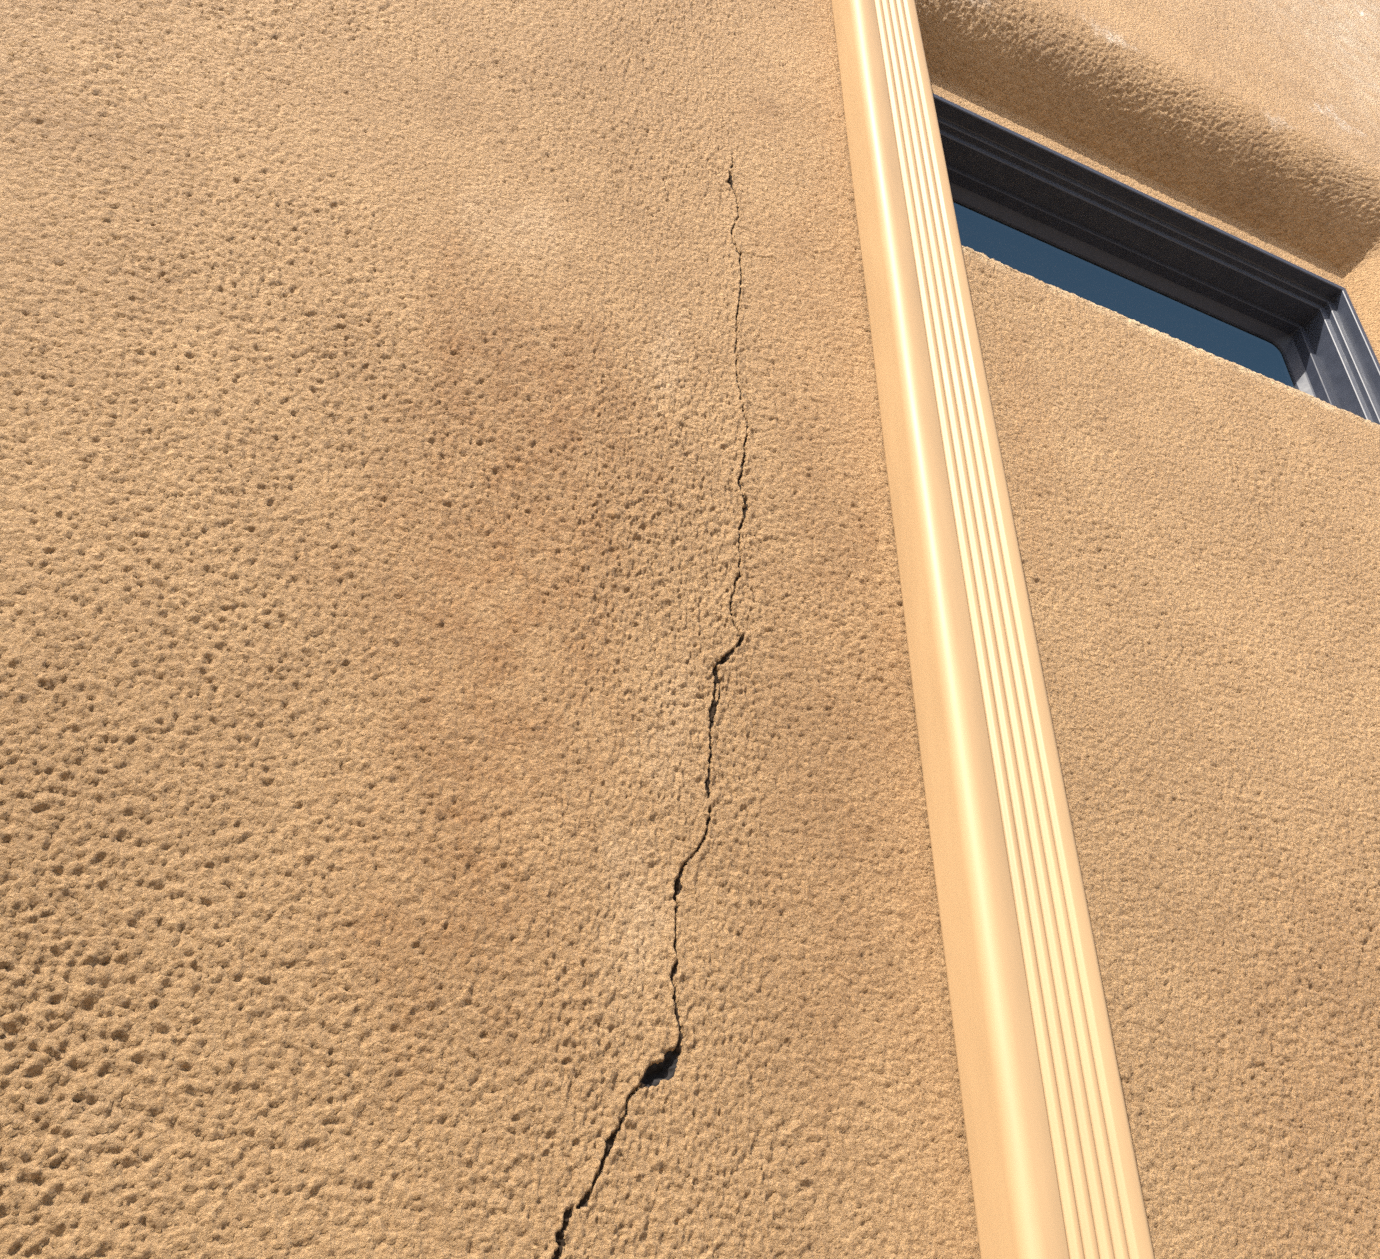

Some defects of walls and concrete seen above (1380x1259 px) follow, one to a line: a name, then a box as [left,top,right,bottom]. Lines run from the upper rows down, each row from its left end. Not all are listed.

crack [551,161,772,1259]